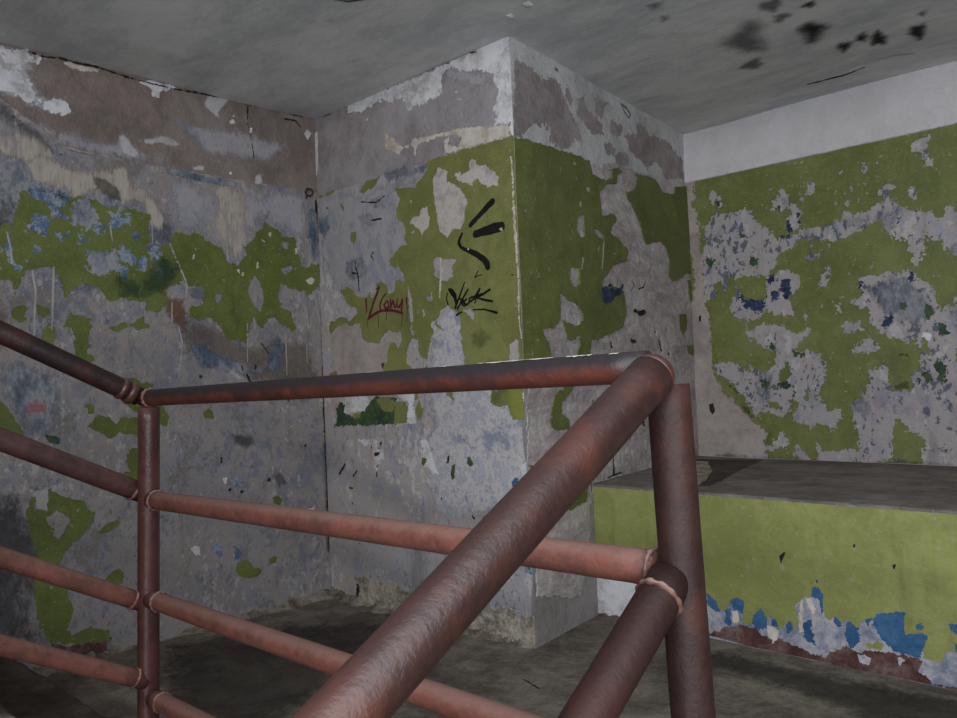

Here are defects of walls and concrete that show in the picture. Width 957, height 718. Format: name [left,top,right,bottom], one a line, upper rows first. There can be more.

water stain [0,110,307,261]
peeling [0,59,957,464]
water stain [185,325,316,380]
peeling [85,399,144,479]
peeling [330,385,610,519]
peeling [546,417,658,549]
peeling [34,579,112,655]
peeling [26,487,121,564]
peeling [105,569,124,584]
peeling [212,543,277,578]
flaking render [524,567,585,599]
peeling [699,495,957,665]